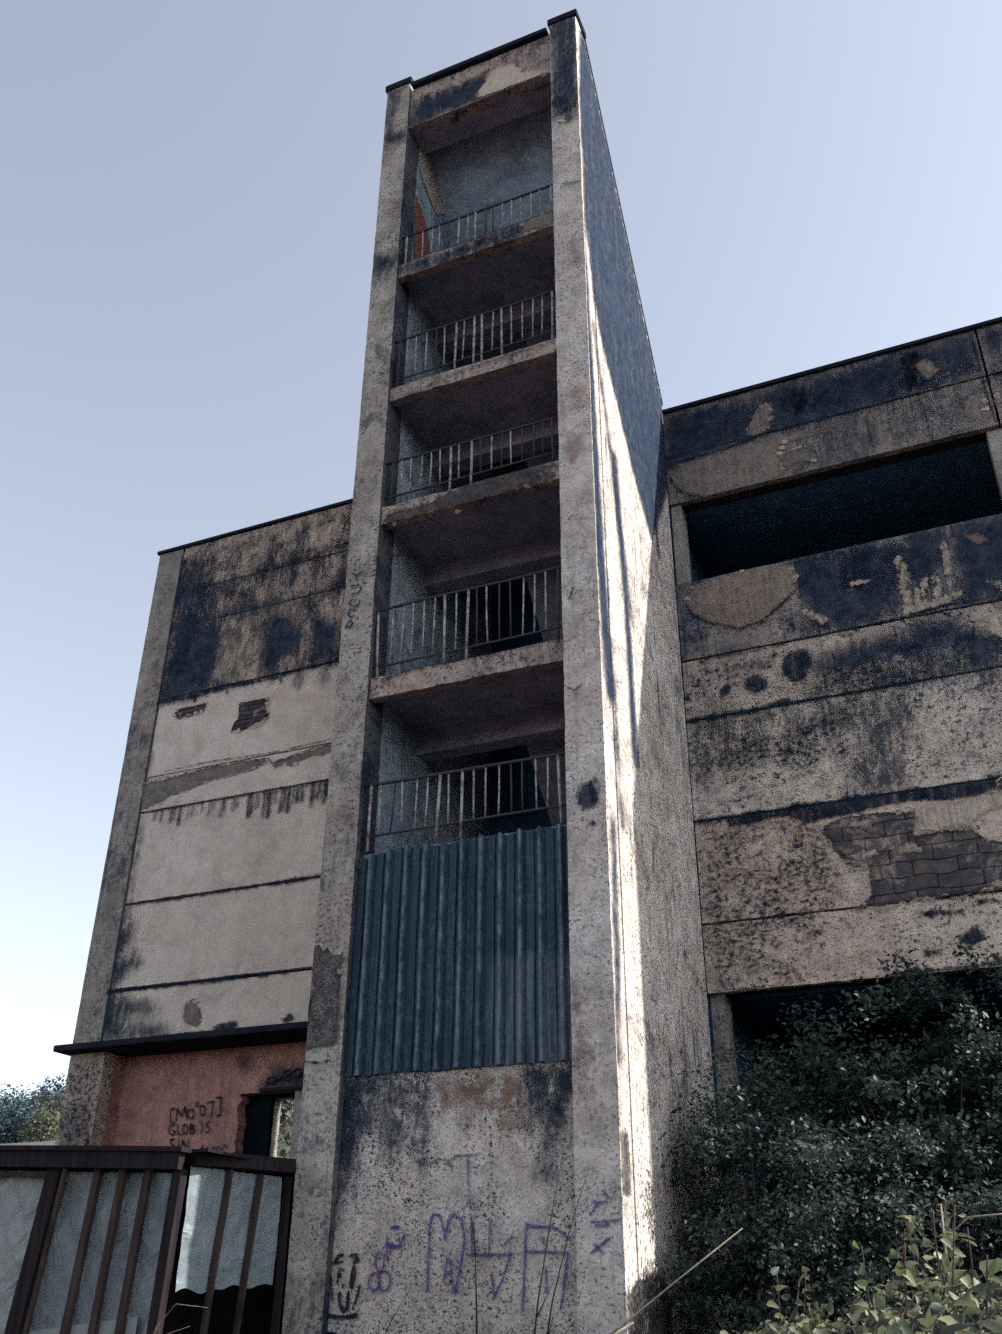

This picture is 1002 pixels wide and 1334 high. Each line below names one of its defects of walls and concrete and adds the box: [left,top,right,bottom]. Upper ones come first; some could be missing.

water stain [550,18,973,780]
water stain [154,518,351,721]
peeling [803,608,828,624]
peeling [893,541,962,616]
spalling [172,702,209,719]
water stain [102,779,328,1040]
peeling [141,744,332,810]
spalling [230,697,271,734]
water stain [578,777,600,826]
water stain [612,811,624,1062]
water stain [686,520,1002,991]
spalling [821,777,1002,913]